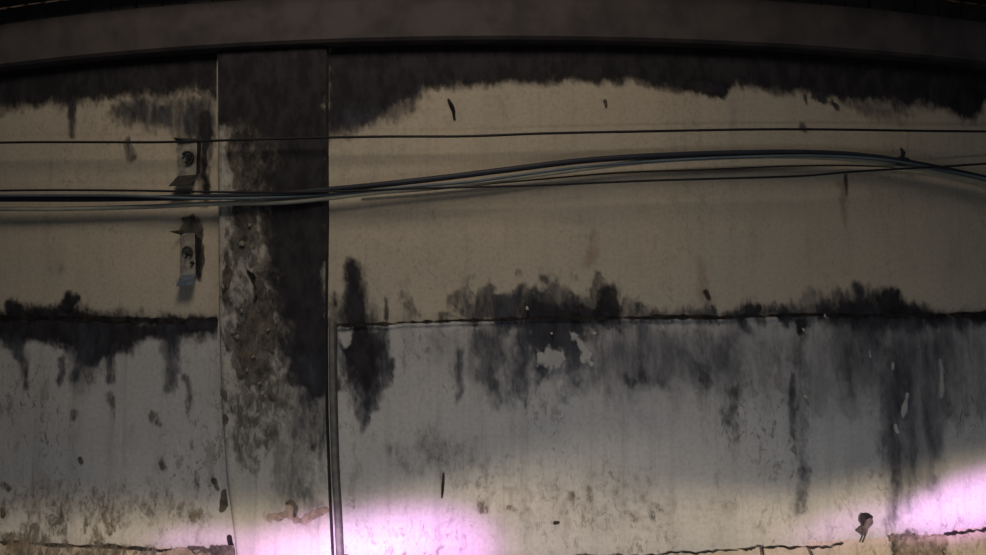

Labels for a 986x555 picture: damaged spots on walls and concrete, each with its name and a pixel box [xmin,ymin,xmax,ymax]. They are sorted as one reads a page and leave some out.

leakage [0,45,986,449]
crack [337,311,986,327]
leakage [689,282,986,482]
crack [439,473,447,498]
crack [945,527,986,536]
crack [0,539,171,552]
spalling [162,545,235,555]
crack [648,542,844,555]
spalling [889,530,949,555]